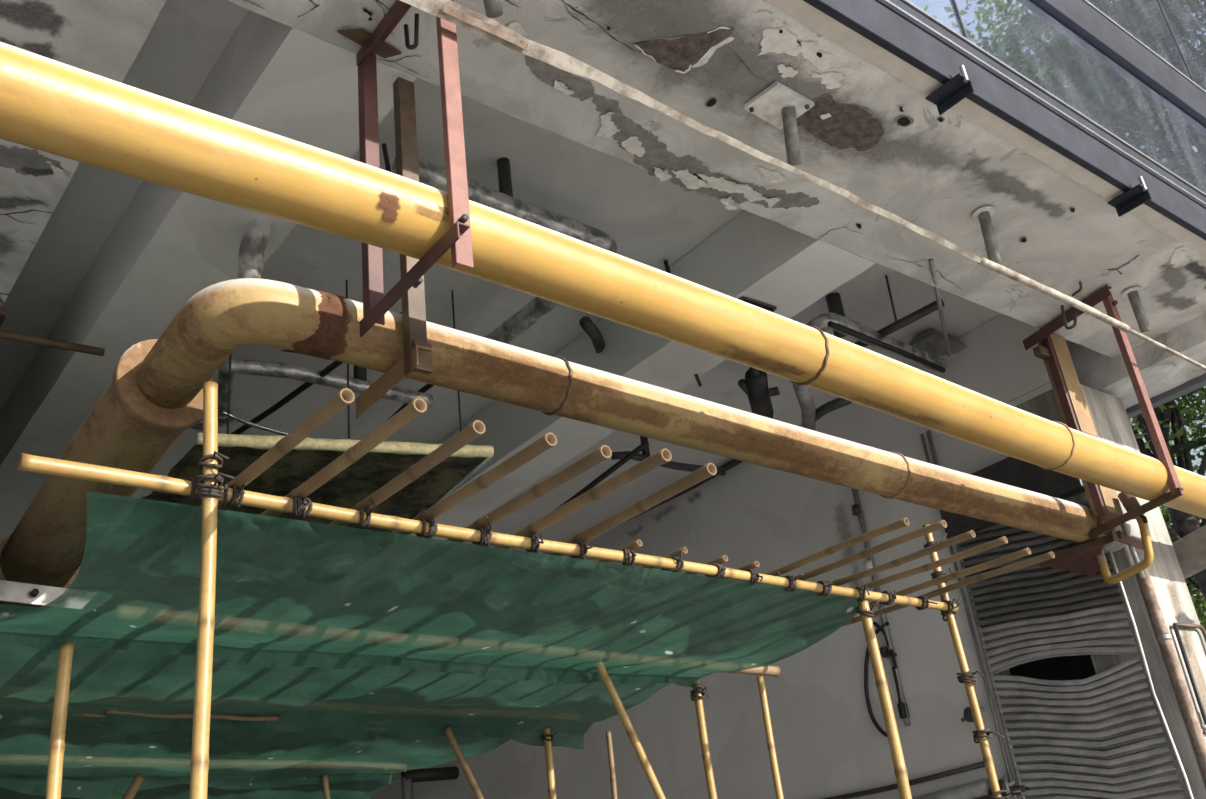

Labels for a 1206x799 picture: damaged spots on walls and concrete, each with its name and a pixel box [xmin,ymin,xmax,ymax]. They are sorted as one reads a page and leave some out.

water stain [0,2,63,59]
peeling [442,4,819,210]
water stain [592,0,848,105]
spalling [757,27,914,151]
water stain [797,114,952,168]
water stain [967,160,1064,217]